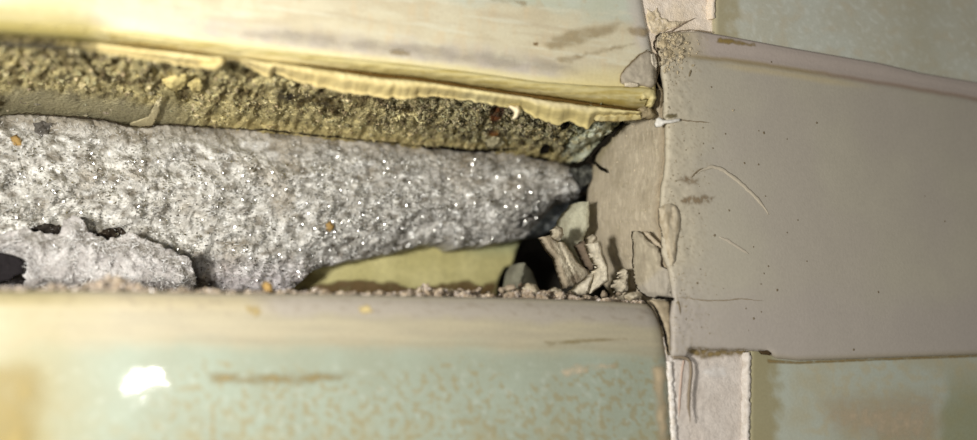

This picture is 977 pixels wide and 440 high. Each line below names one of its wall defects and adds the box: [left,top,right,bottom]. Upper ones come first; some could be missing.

peeling [0,36,657,164]